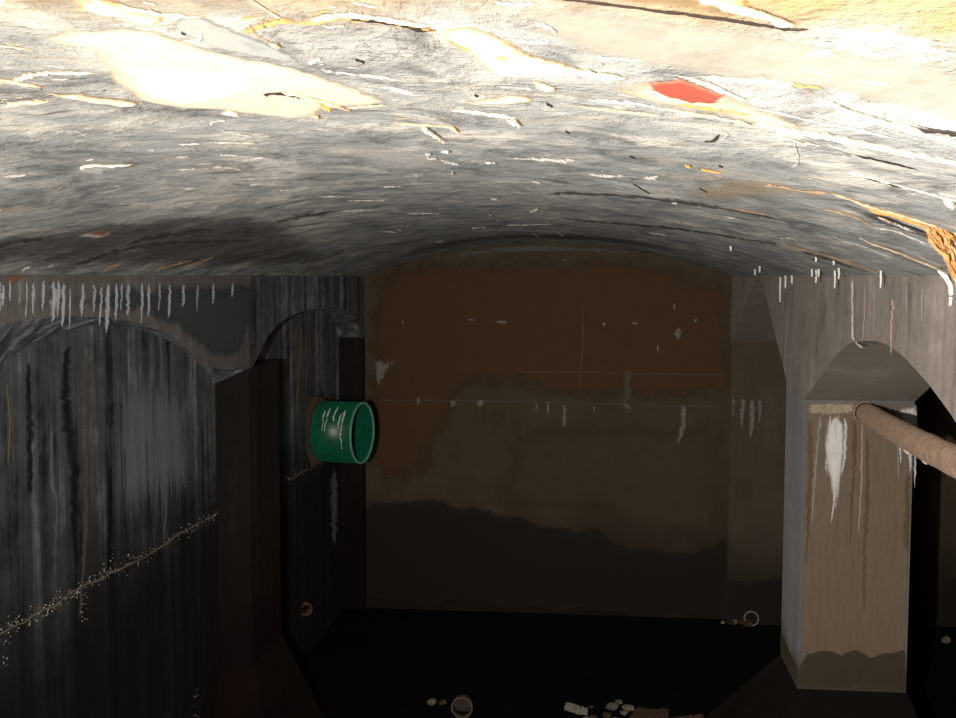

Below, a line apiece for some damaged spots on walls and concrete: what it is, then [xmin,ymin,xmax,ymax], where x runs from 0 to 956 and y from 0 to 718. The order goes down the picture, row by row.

peeling [48,0,383,118]
crack [240,2,434,49]
spalling [442,28,625,82]
peeling [563,0,808,31]
rust [762,184,938,237]
water stain [0,228,254,354]
water stain [0,349,218,665]
water stain [366,402,918,690]